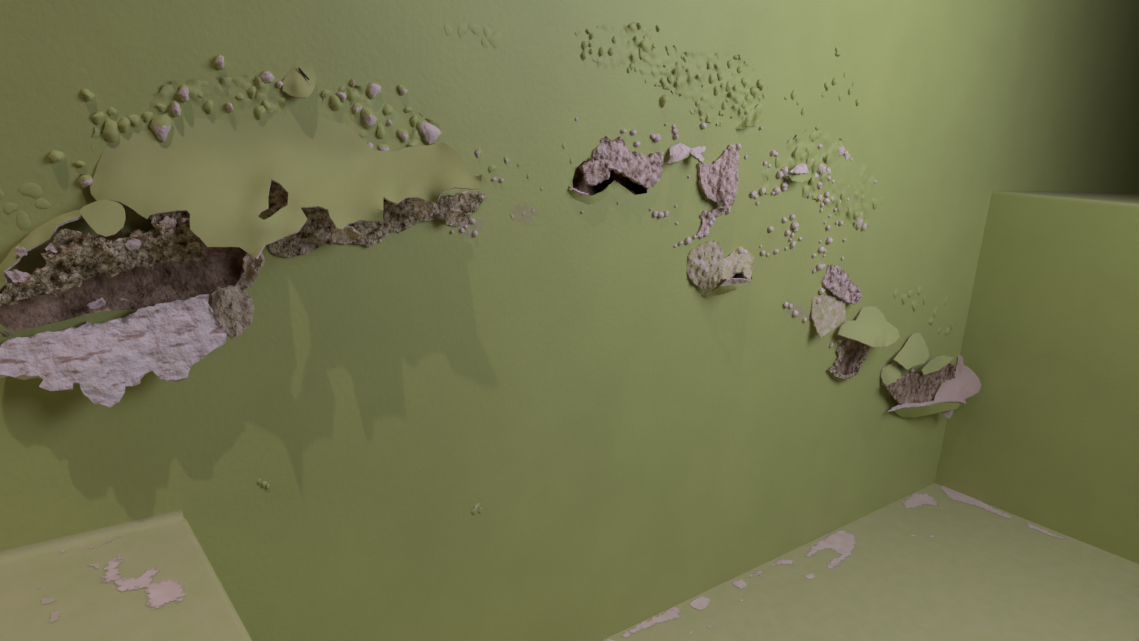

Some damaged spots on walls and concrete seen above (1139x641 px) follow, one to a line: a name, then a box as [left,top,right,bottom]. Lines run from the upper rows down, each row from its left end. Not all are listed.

peeling [282,58,317,99]
flaking render [562,123,740,247]
flaking render [0,112,503,408]
flaking render [811,264,981,419]
flaking render [89,555,186,609]
flaking render [733,530,857,602]
flaking render [606,596,710,641]